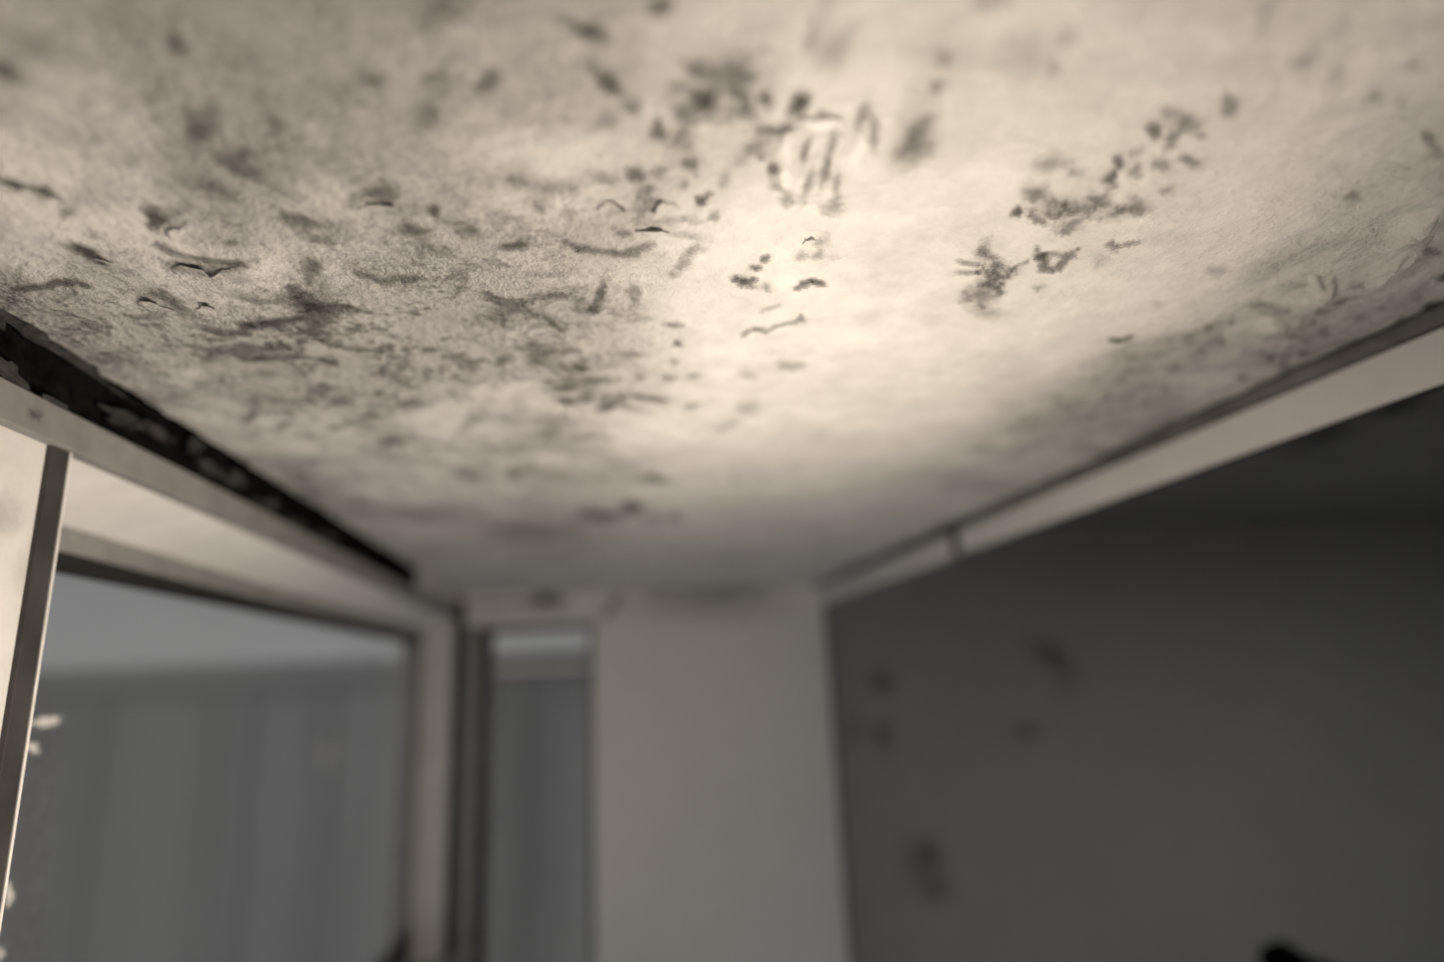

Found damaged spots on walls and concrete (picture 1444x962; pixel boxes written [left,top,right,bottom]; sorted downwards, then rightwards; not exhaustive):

water stain [590,67,620,96]
water stain [652,120,666,141]
water stain [757,96,812,137]
water stain [627,170,645,183]
water stain [1101,158,1122,189]
water stain [401,207,441,239]
water stain [731,257,769,289]
water stain [963,263,1017,288]
water stain [1035,250,1050,274]
water stain [589,279,608,315]
water stain [554,378,605,406]